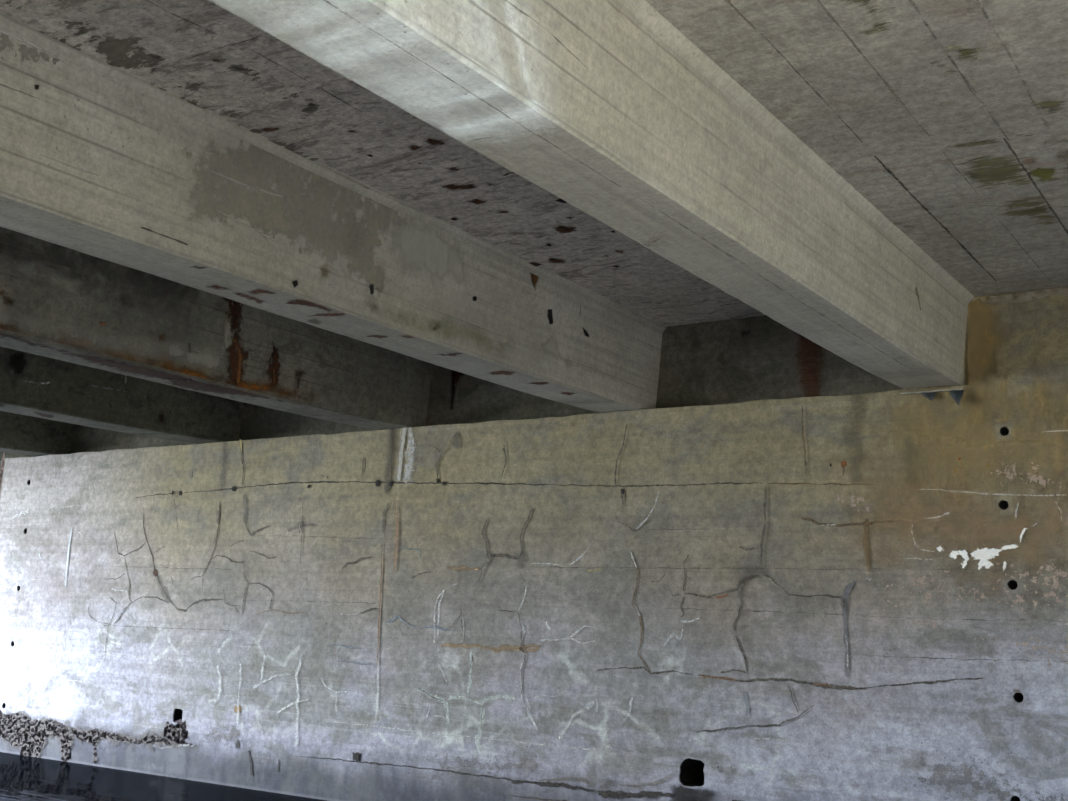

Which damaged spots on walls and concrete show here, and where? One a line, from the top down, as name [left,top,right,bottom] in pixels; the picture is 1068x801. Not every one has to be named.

rust [410,139,445,151]
rust [443,182,493,205]
rust [555,217,577,233]
rust [0,285,304,404]
rust [797,335,822,397]
peeling [989,451,1062,492]
crack [88,444,314,655]
crack [360,607,463,640]
crack [478,508,533,582]
crack [597,426,983,732]
peeling [862,556,1068,656]
damp [671,784,714,801]